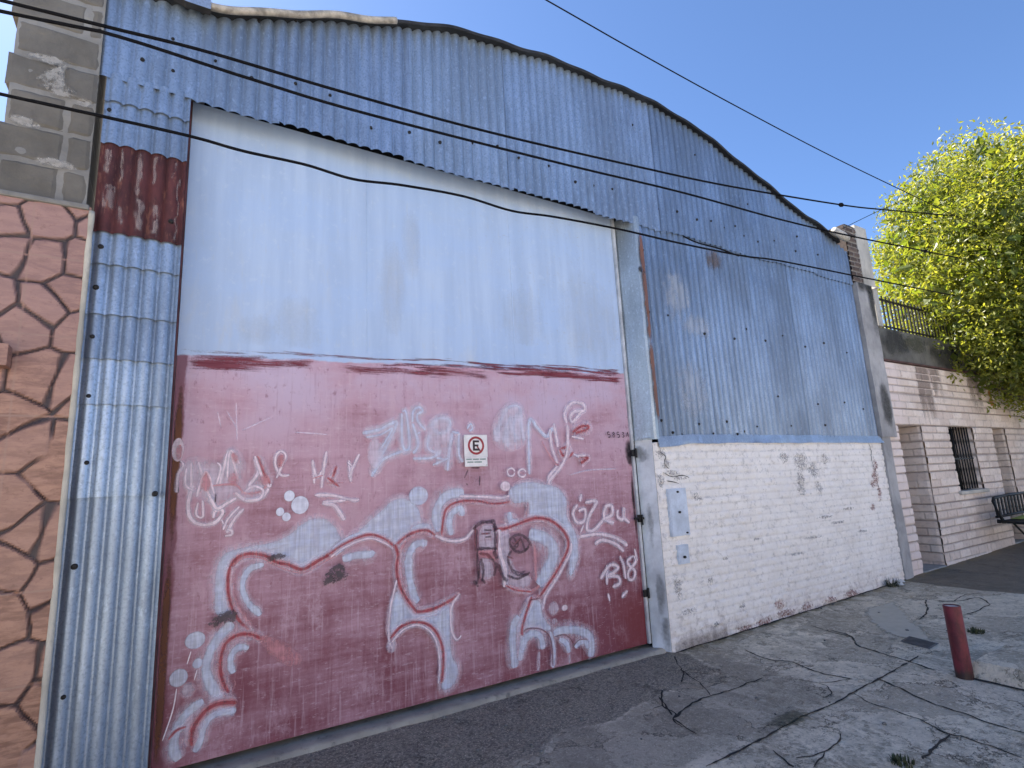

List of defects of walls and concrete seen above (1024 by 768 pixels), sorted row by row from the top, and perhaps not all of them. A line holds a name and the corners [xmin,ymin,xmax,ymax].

rust [639,235,660,417]
water stain [882,387,892,422]
peeling [780,454,827,495]
crack [918,593,990,620]
crack [655,626,1024,759]
crack [773,733,841,767]